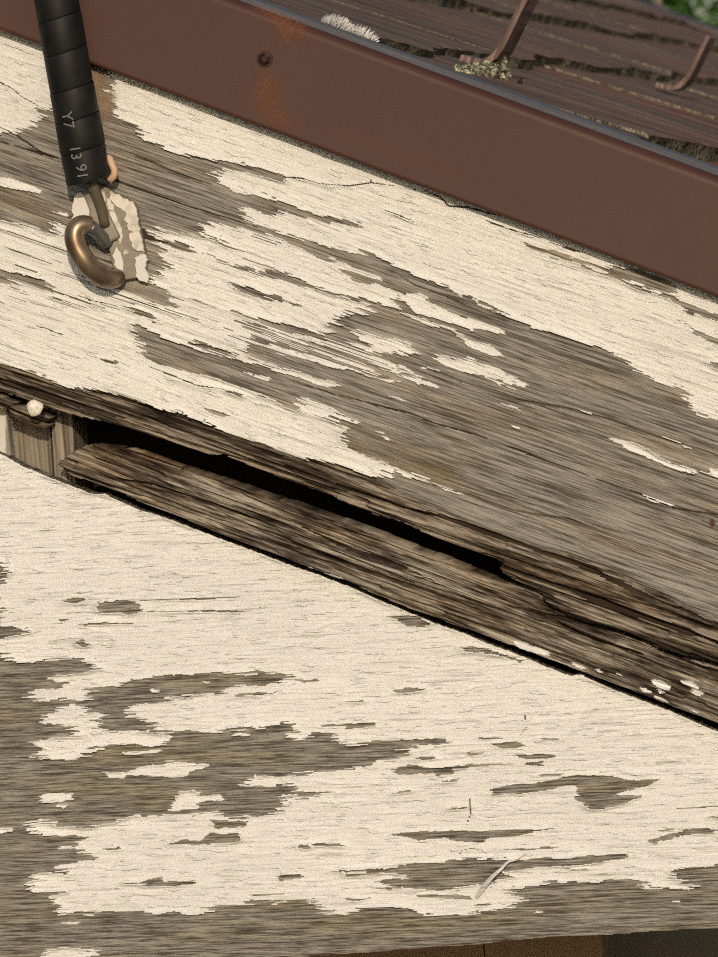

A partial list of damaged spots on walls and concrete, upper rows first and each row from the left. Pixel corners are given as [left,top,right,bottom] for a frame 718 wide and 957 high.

peeling [0,63,718,627]
crack [191,343,718,515]
crack [107,477,260,520]
crack [302,527,434,582]
peeling [0,607,31,639]
crack [139,597,244,612]
peeling [0,639,718,957]